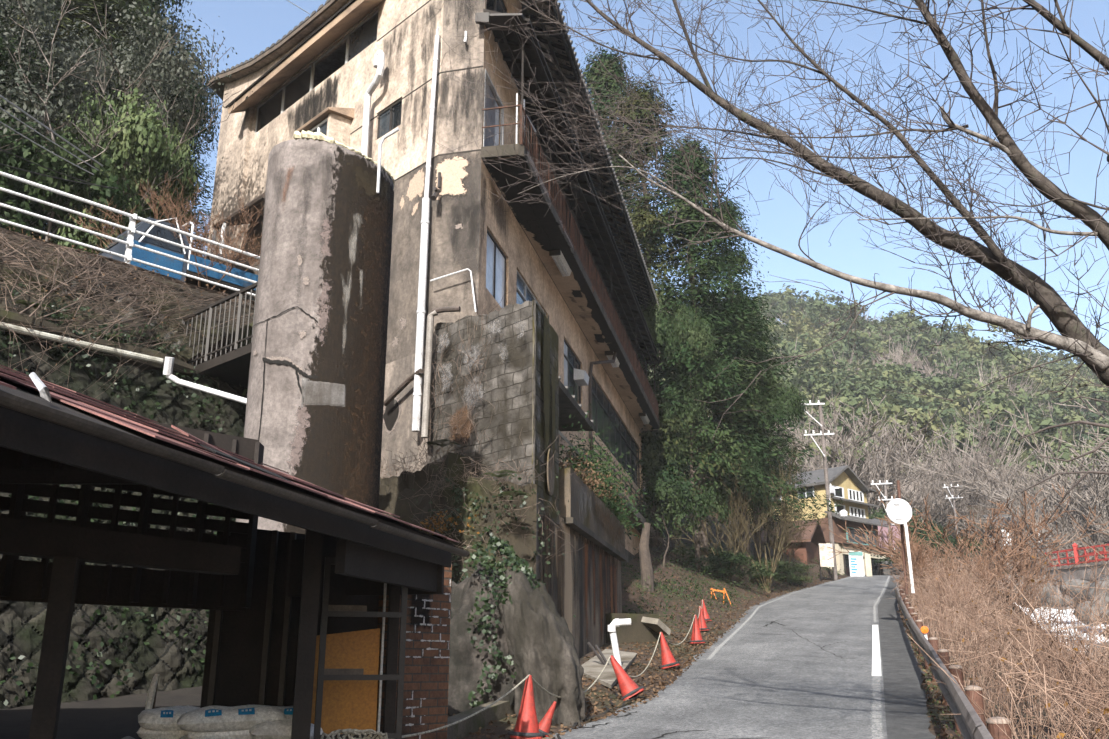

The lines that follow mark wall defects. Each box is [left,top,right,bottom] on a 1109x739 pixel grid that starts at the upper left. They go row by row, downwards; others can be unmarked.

water stain [404,74,484,119]
peeling [400,156,470,216]
crack [253,306,318,440]